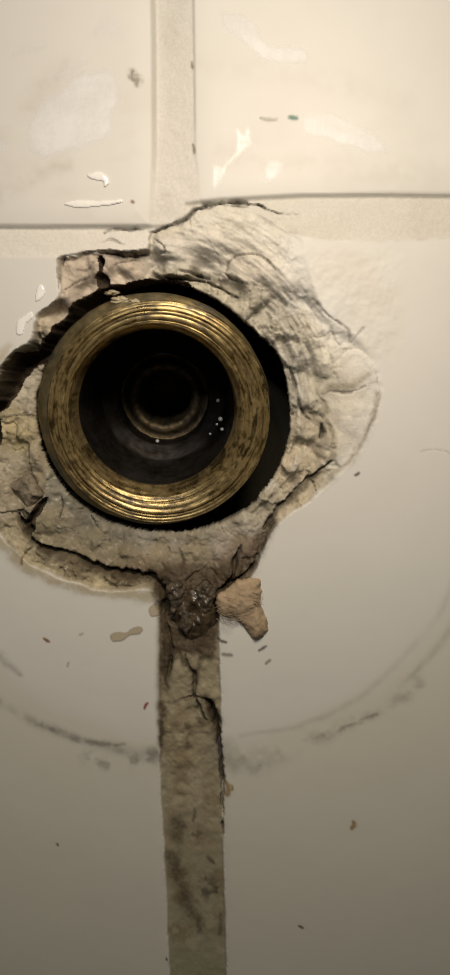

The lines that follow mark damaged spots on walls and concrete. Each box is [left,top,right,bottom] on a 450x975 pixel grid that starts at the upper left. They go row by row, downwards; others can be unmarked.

crack [0,206,238,445]
spalling [0,198,384,620]
crack [21,497,129,572]
crack [217,737,225,834]